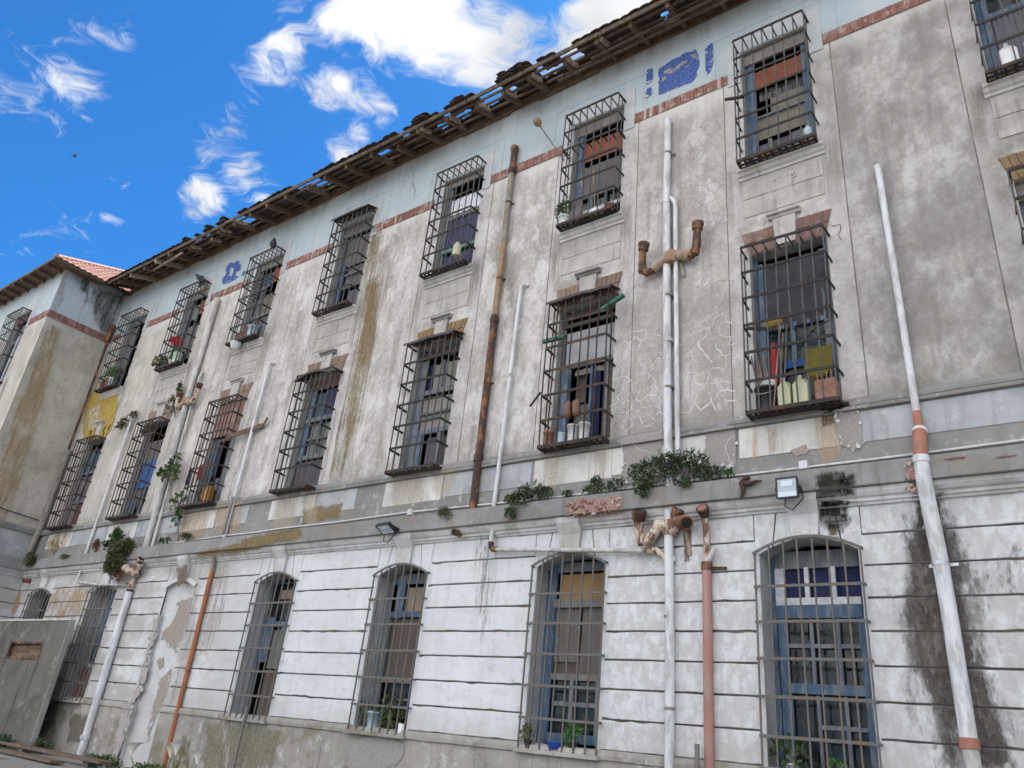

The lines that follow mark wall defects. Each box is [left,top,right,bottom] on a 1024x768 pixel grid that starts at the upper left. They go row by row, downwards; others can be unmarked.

peeling [645,43,714,99]
water stain [81,278,125,332]
water stain [334,227,382,466]
spalling [565,496,624,519]
crack [610,278,738,453]
water stain [816,472,855,535]
peeling [833,405,865,452]
peeling [113,598,192,756]
water stain [901,501,959,767]
water stain [936,493,1014,768]